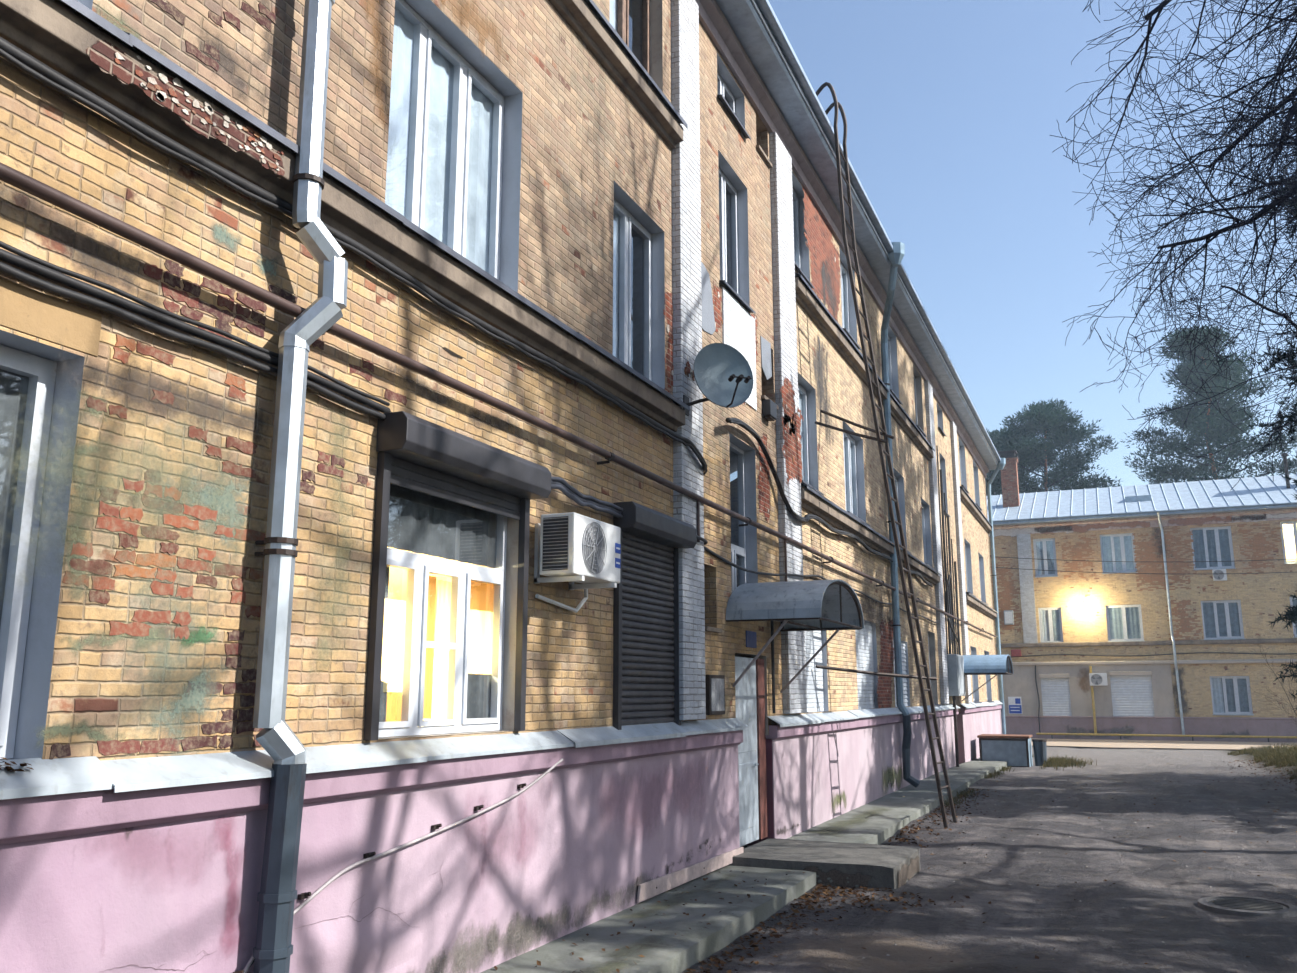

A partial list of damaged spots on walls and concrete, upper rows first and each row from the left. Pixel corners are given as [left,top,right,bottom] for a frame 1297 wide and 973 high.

peeling [149,0,187,25]
peeling [208,1,276,32]
flaking render [86,40,285,176]
peeling [802,187,841,322]
flaking render [758,376,804,522]
crack [100,950,214,972]
damp [429,858,691,973]